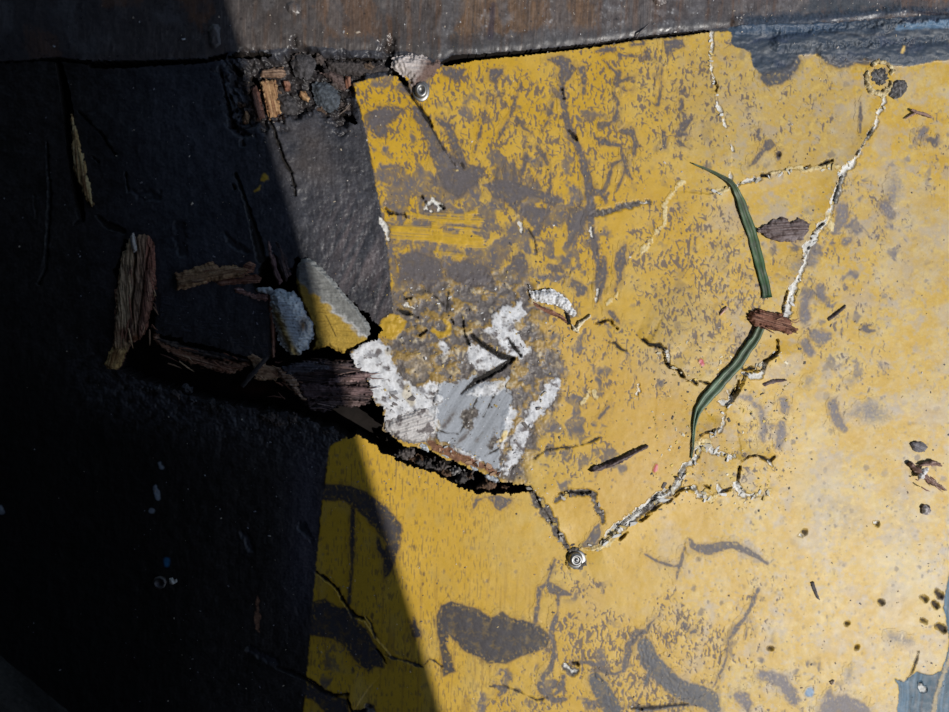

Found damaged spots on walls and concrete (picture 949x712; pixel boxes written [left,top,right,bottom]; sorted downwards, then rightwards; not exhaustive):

peeling [350,336,452,444]
crack [378,194,446,241]
crack [400,81,466,169]
peeling [392,245,496,293]
crack [396,289,523,395]
peeling [459,297,532,432]
peeling [485,376,563,479]
crack [516,220,538,256]
crack [526,77,781,552]
crack [708,30,887,318]
peeling [910,441,928,452]
peeling [466,492,523,515]